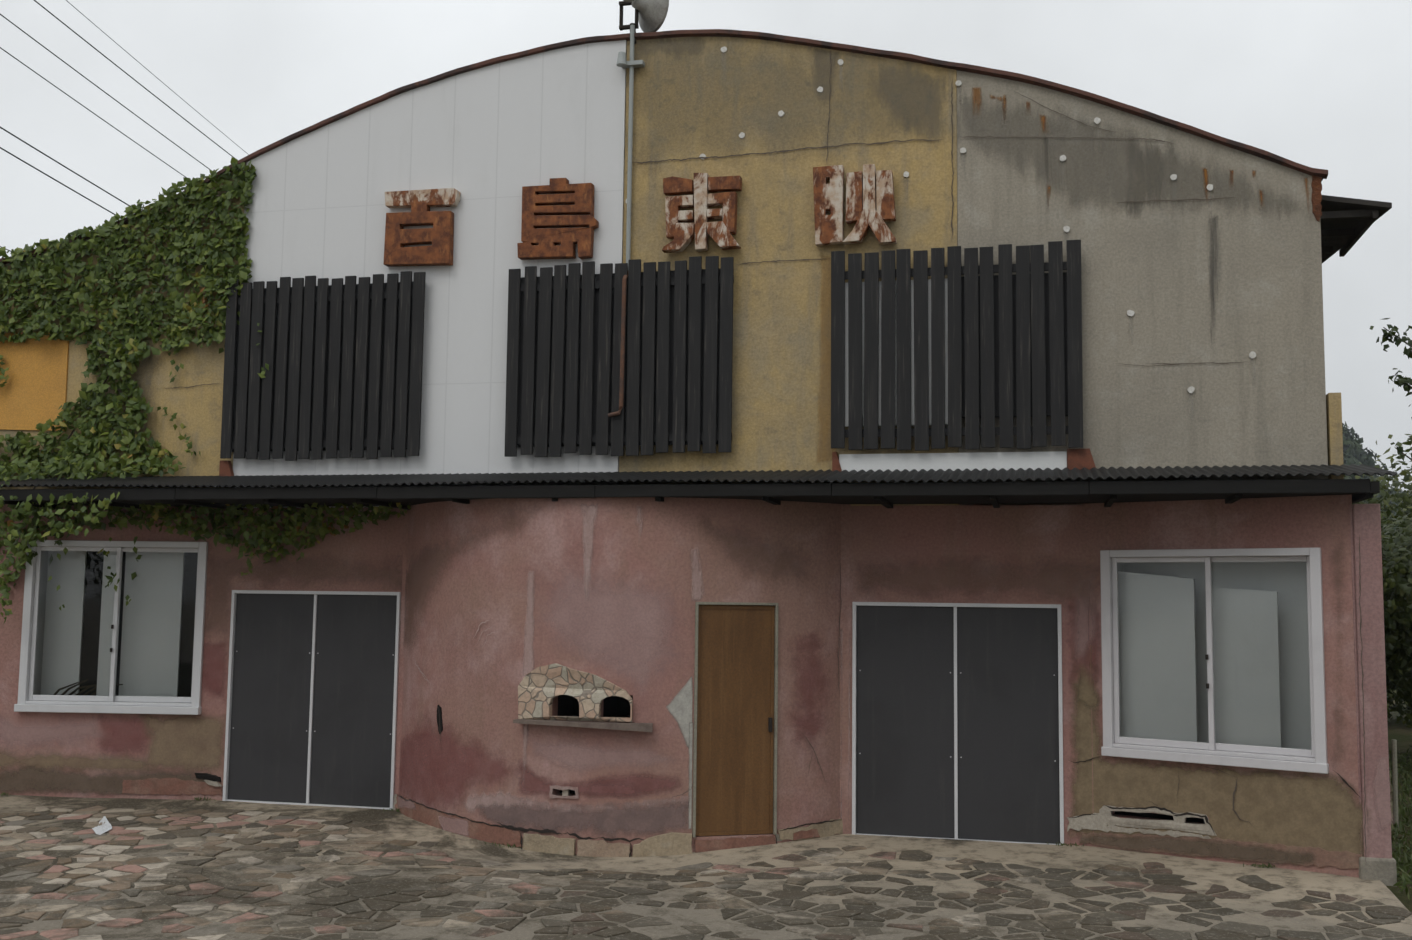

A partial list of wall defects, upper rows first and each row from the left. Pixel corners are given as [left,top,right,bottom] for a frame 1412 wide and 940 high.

rust [972,87,1006,116]
damp [523,572,533,678]
damp [399,724,689,837]
peeling [1069,643,1364,863]